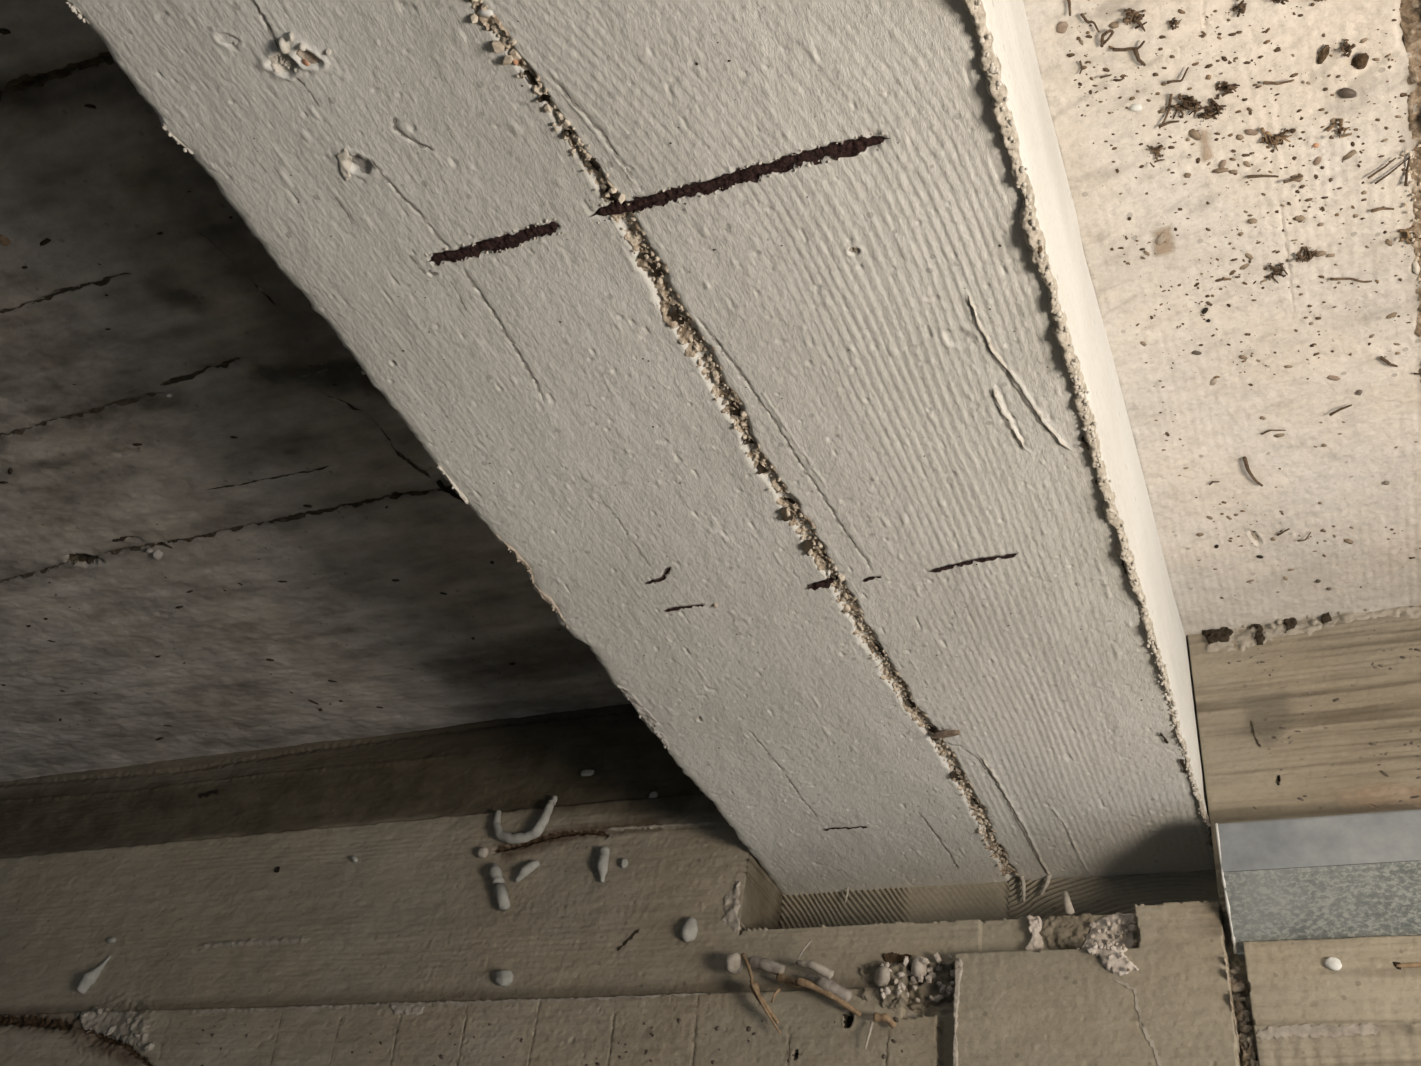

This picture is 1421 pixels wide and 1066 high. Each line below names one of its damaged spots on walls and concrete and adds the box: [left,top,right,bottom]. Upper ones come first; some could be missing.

crack [0,52,115,101]
spalling [269,32,331,73]
crack [553,80,634,180]
rust [591,132,900,224]
rust [425,218,564,267]
crack [0,358,241,436]
crack [0,393,452,583]
crack [695,313,874,574]
crack [749,731,820,821]
crack [918,813,958,869]
crack [944,742,1050,875]
crack [0,1011,171,1066]